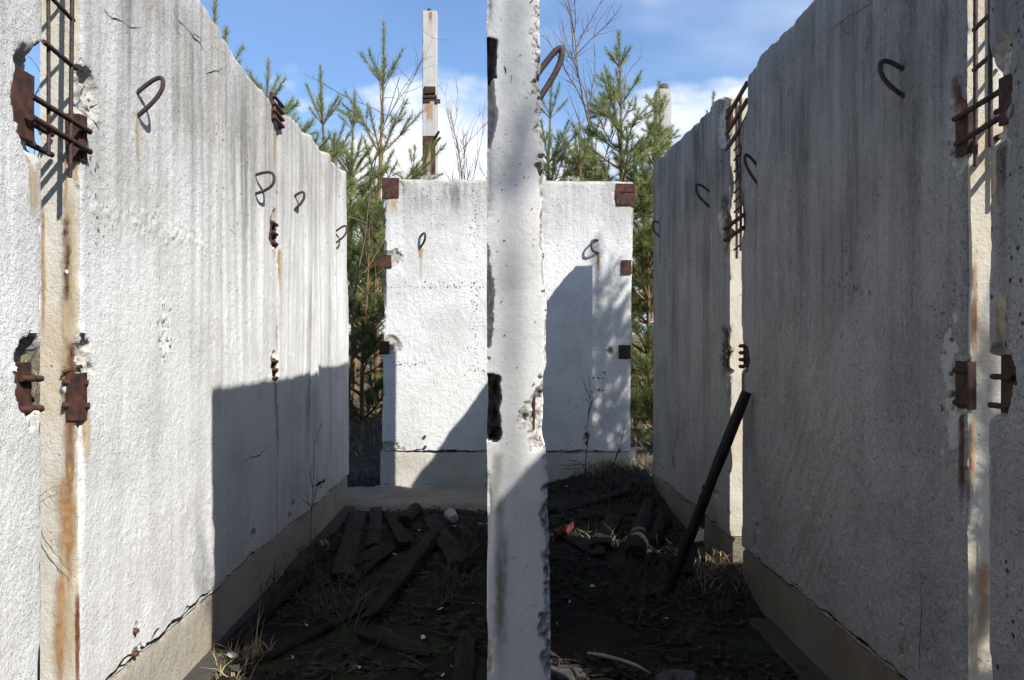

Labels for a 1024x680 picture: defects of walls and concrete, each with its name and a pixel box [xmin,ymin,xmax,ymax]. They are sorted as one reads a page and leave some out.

spalling [13,40,41,72]
spalling [73,57,99,126]
corrosion [952,77,967,111]
spalling [13,120,41,171]
spalling [517,0,547,469]
corrosion [62,160,78,379]
spalling [384,179,506,442]
spalling [12,324,40,372]
spalling [21,410,39,430]
corrosion [958,417,975,486]
corrosion [56,409,90,680]